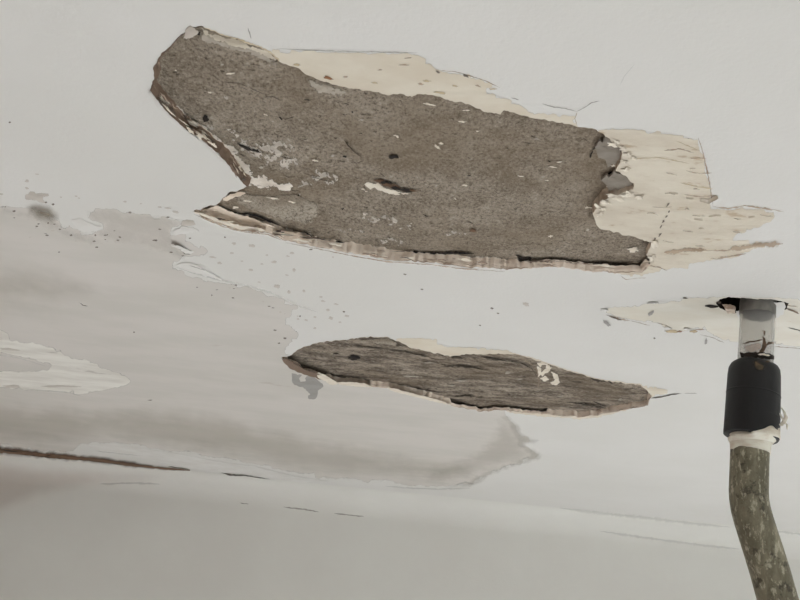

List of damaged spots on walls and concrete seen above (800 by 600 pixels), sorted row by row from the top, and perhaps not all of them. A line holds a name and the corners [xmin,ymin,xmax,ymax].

flaking render [0,26,800,487]
damp [292,373,323,399]
crack [0,447,190,471]